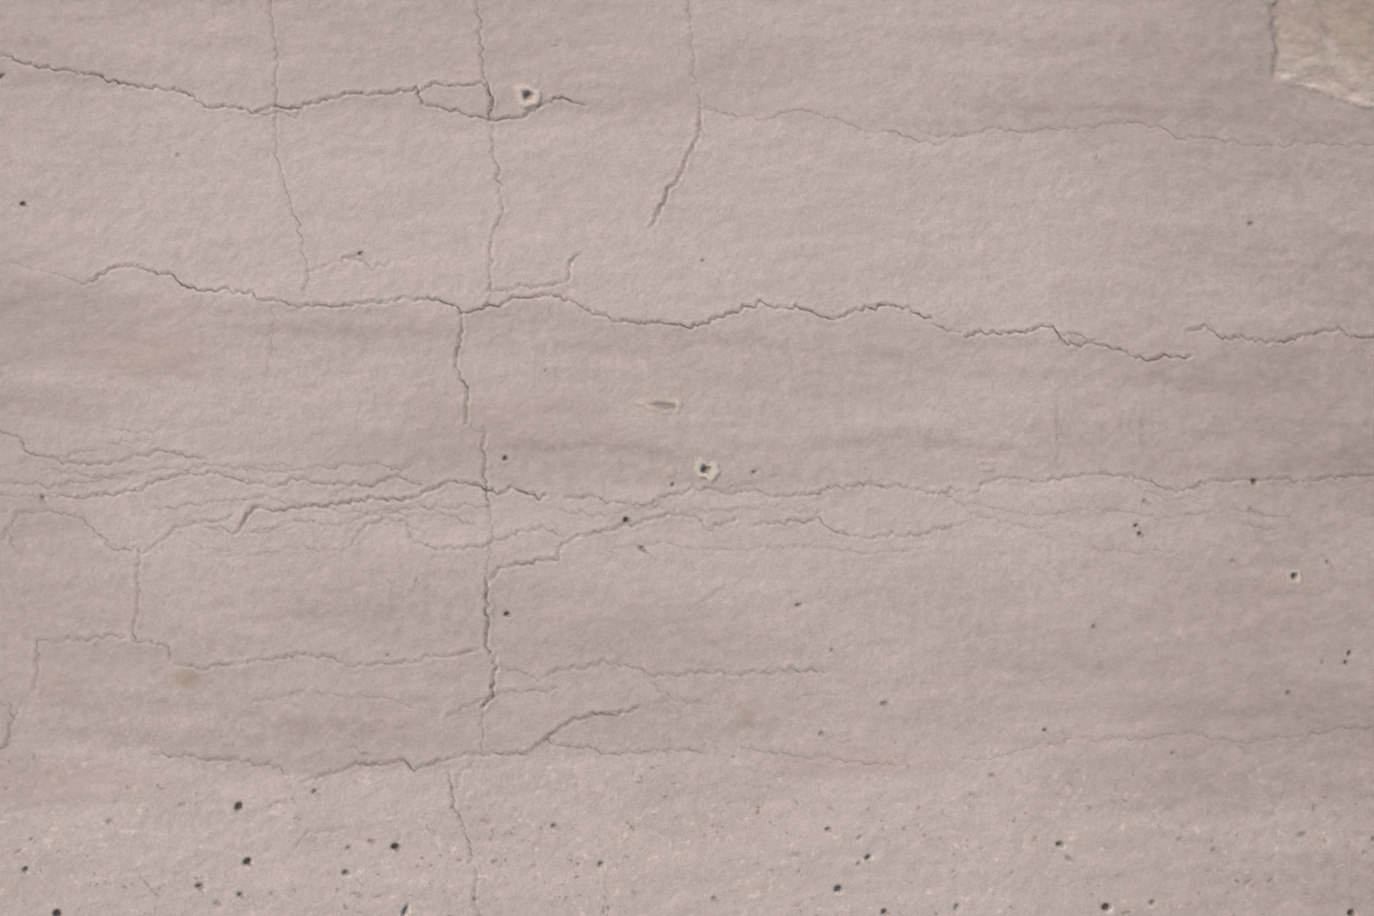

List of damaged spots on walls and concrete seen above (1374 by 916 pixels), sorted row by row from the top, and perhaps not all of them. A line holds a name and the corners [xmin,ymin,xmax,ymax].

peeling [1270,0,1374,106]
crack [428,296,558,313]
crack [465,592,491,652]